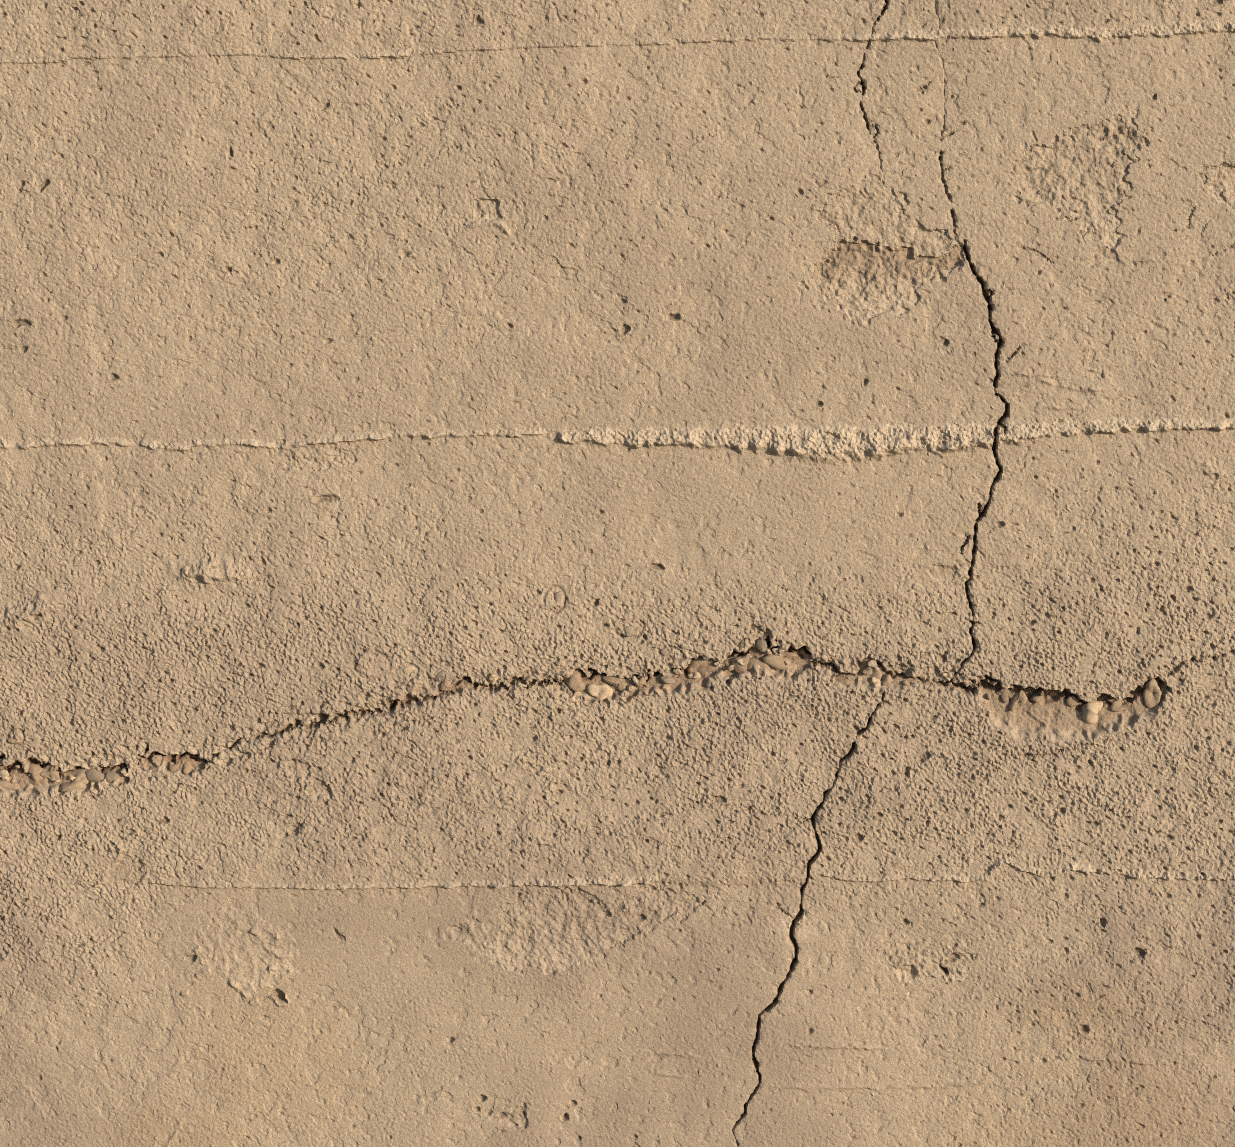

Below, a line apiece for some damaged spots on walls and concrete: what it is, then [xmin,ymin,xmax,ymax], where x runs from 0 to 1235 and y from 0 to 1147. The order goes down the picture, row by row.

crack [825,0,891,186]
crack [918,79,934,97]
crack [916,108,933,128]
crack [934,0,969,242]
crack [1171,205,1198,235]
crack [1020,246,1056,265]
crack [1211,242,1235,258]
crack [1166,637,1235,678]
crack [0,239,1022,1147]
crack [1001,742,1090,761]